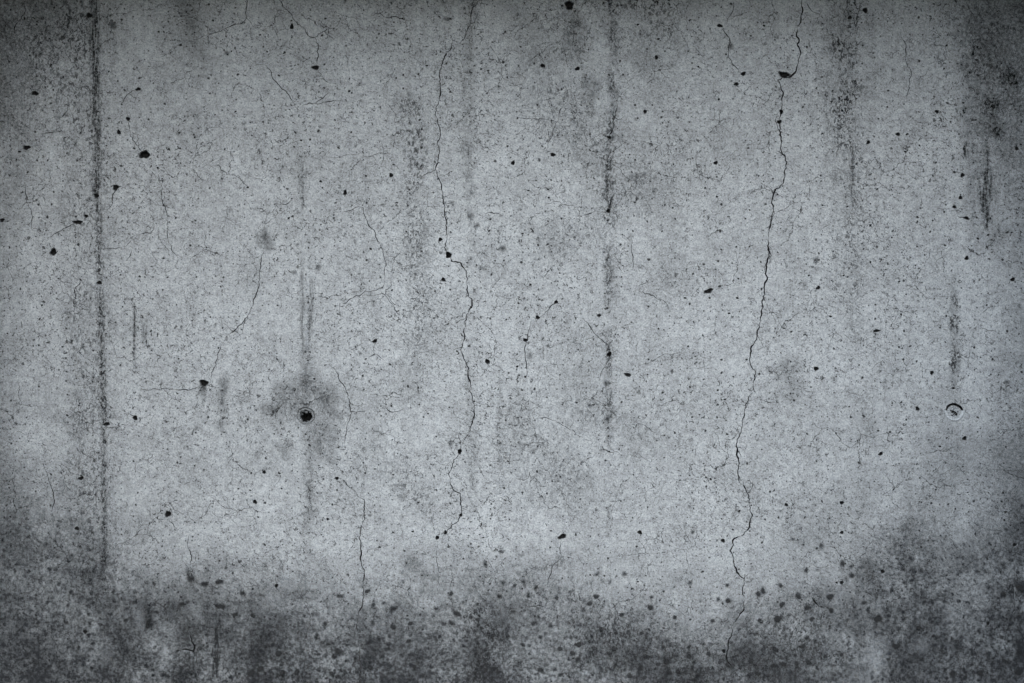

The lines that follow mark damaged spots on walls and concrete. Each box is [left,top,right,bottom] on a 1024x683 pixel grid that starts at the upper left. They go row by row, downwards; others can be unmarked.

crack [424,0,481,583]
water stain [0,504,1024,683]
crack [720,3,743,75]
crack [725,0,822,671]